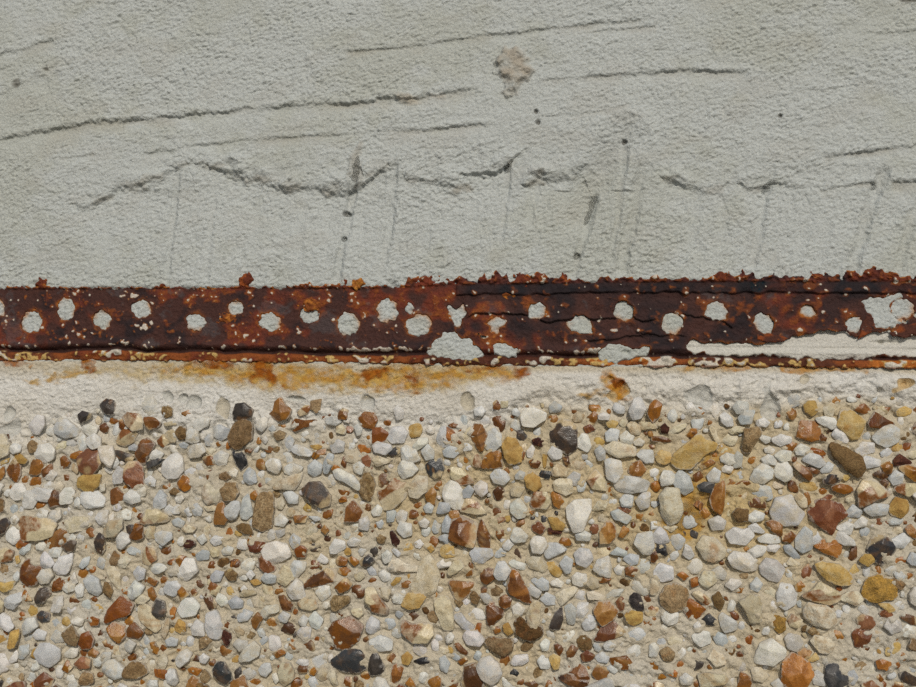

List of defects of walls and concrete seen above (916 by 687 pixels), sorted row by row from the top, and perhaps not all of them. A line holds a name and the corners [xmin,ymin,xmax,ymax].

rust [5,277,143,289]
rust [223,272,274,288]
rust [285,278,389,313]
rust [400,270,585,299]
rust [597,266,916,283]
rust [686,293,916,374]
rust [30,360,95,385]
rust [184,332,529,389]
rust [598,344,650,400]